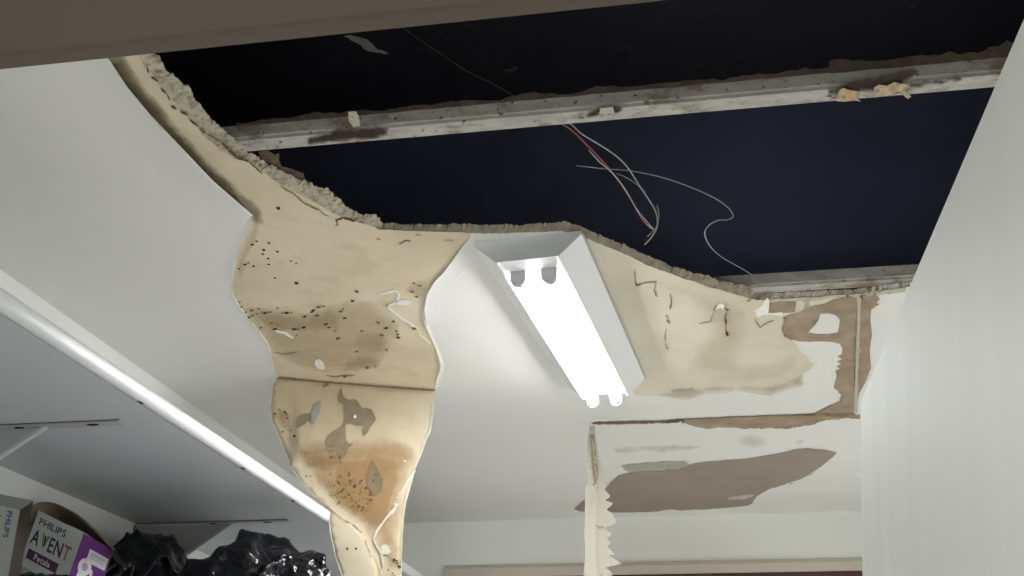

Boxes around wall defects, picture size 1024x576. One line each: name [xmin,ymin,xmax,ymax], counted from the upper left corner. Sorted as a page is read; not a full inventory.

mould [238,302,340,340]
peeling [108,53,910,576]
water stain [273,409,407,528]